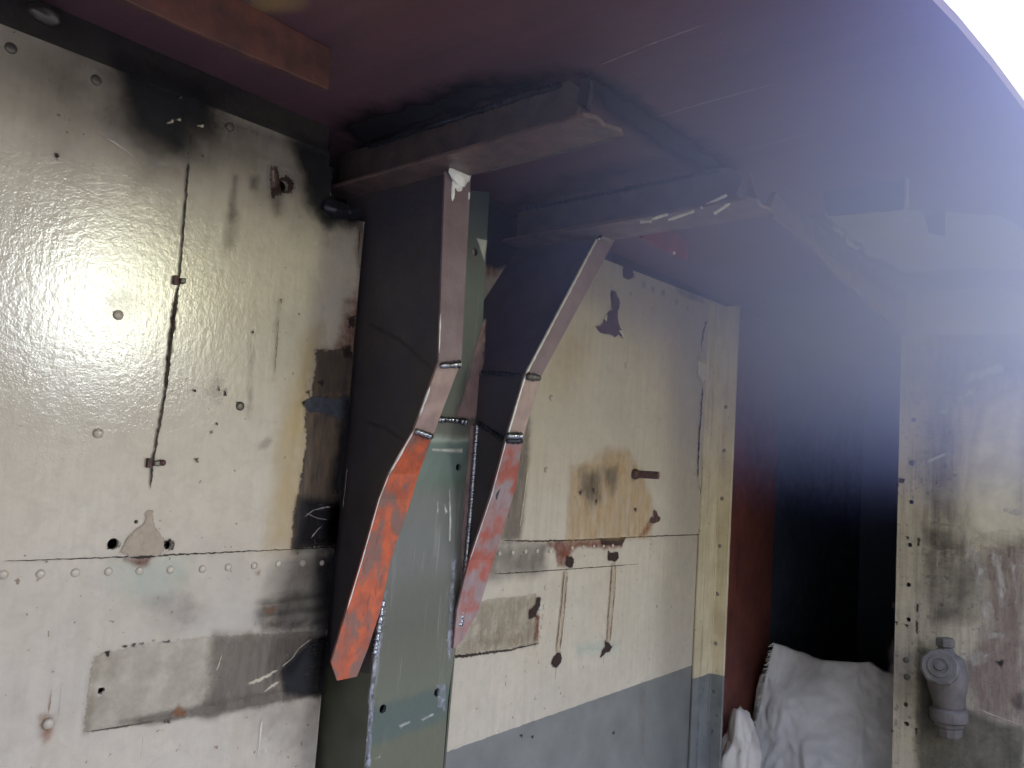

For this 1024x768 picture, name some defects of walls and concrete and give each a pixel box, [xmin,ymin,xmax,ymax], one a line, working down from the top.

water stain [115,57,212,152]
crack [150,137,191,488]
peeling [591,291,626,340]
peeling [107,510,175,559]
rust [549,538,626,676]